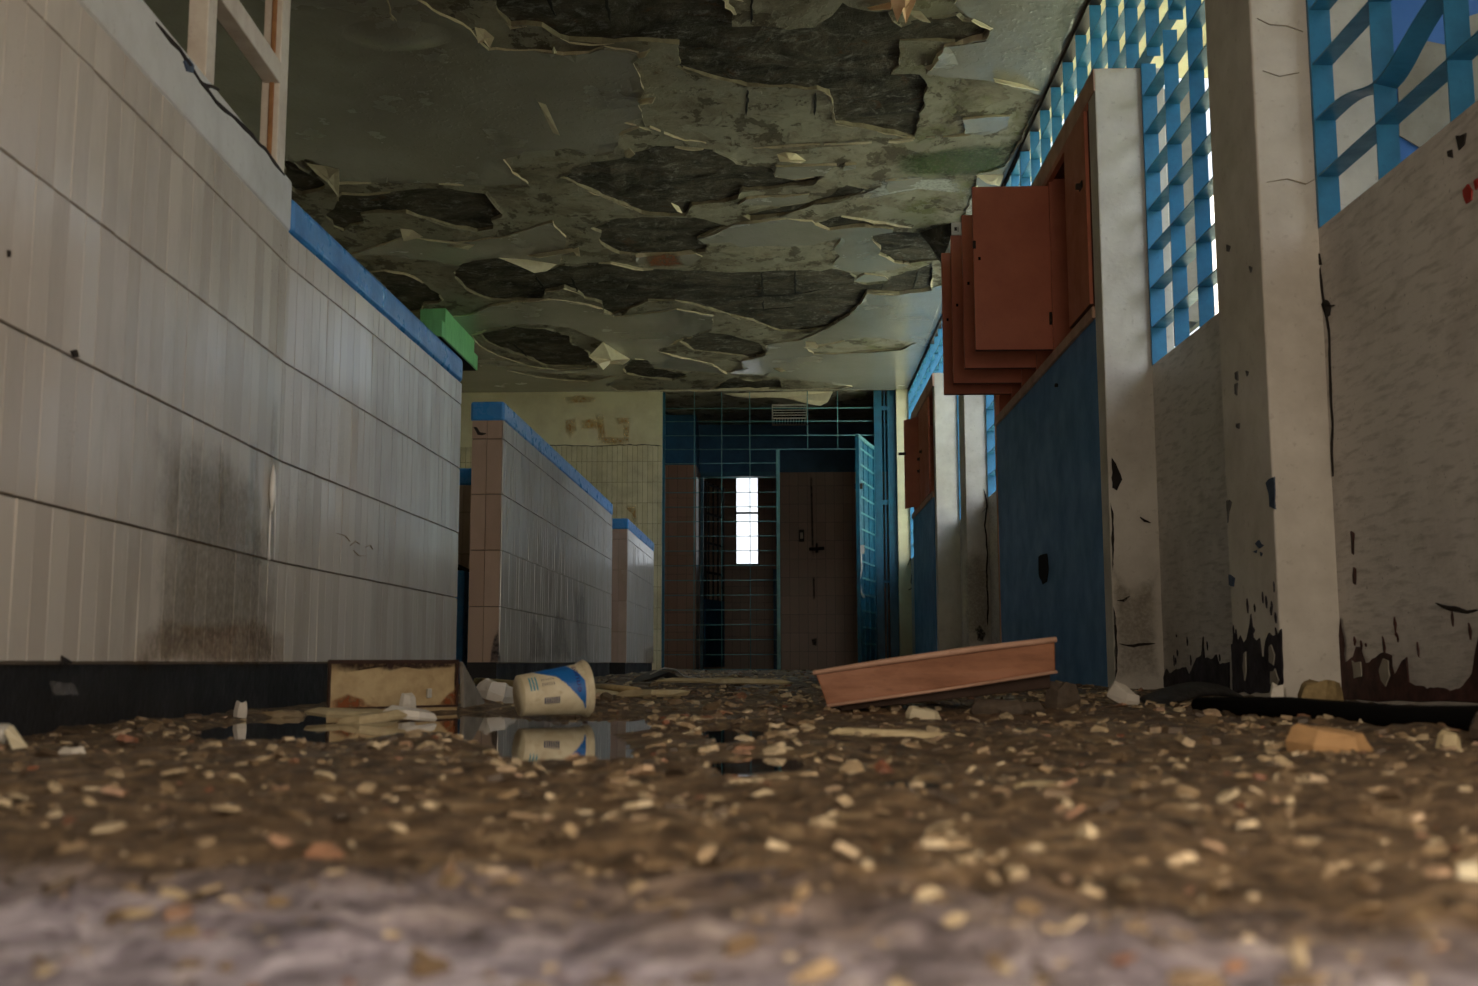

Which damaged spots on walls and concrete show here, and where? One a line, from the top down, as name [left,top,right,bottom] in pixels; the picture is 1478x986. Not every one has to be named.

crack [155,21,285,176]
peeling [284,0,1041,406]
crack [1319,267,1336,476]
peeling [1163,574,1284,695]
peeling [1339,611,1478,703]